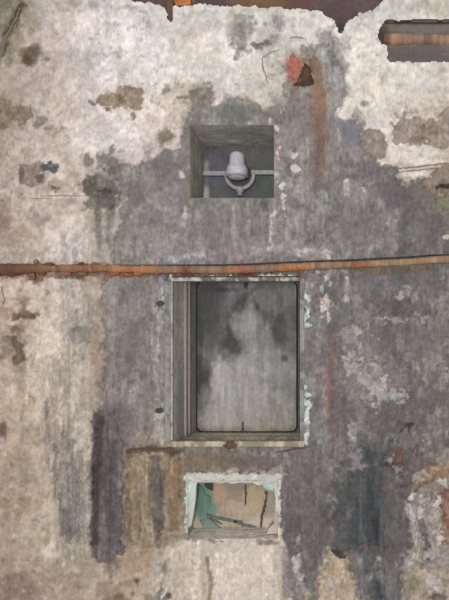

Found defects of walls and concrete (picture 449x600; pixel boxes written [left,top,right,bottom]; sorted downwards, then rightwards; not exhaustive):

spalling [378,19,449,63]
water stain [61,232,85,265]
rust [0,259,306,282]
peeling [97,33,449,600]
water stain [44,276,125,569]